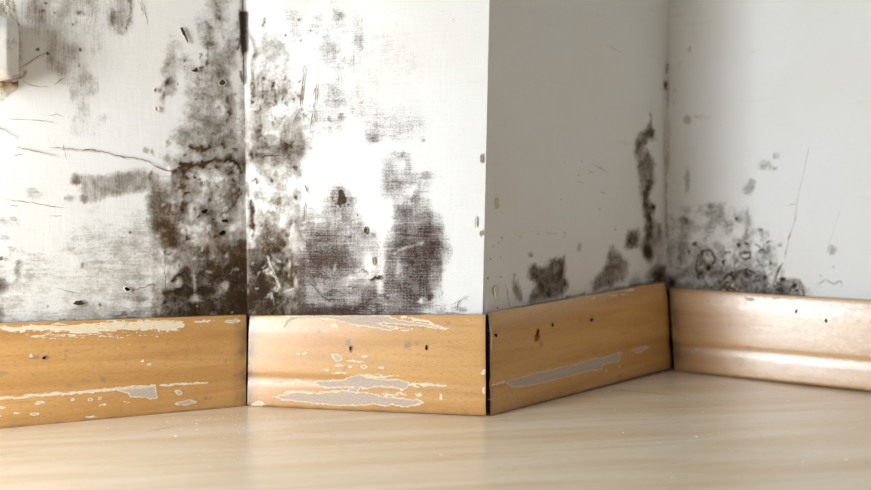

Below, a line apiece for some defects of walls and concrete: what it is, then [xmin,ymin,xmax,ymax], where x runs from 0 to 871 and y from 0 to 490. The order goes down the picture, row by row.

spalling [0,81,18,102]
crack [0,114,172,172]
water stain [71,0,445,319]
water stain [594,114,803,295]
water stain [516,256,584,300]
peeling [175,390,197,406]